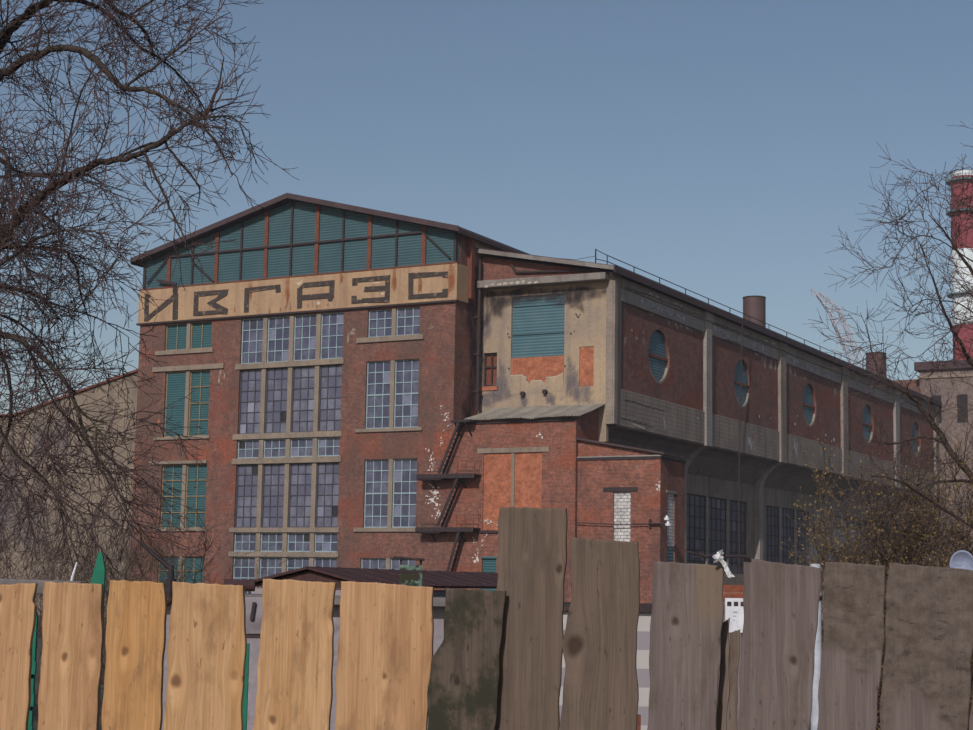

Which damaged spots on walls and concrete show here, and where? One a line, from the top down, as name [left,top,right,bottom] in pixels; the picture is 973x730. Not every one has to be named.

spalling [508,366,566,394]